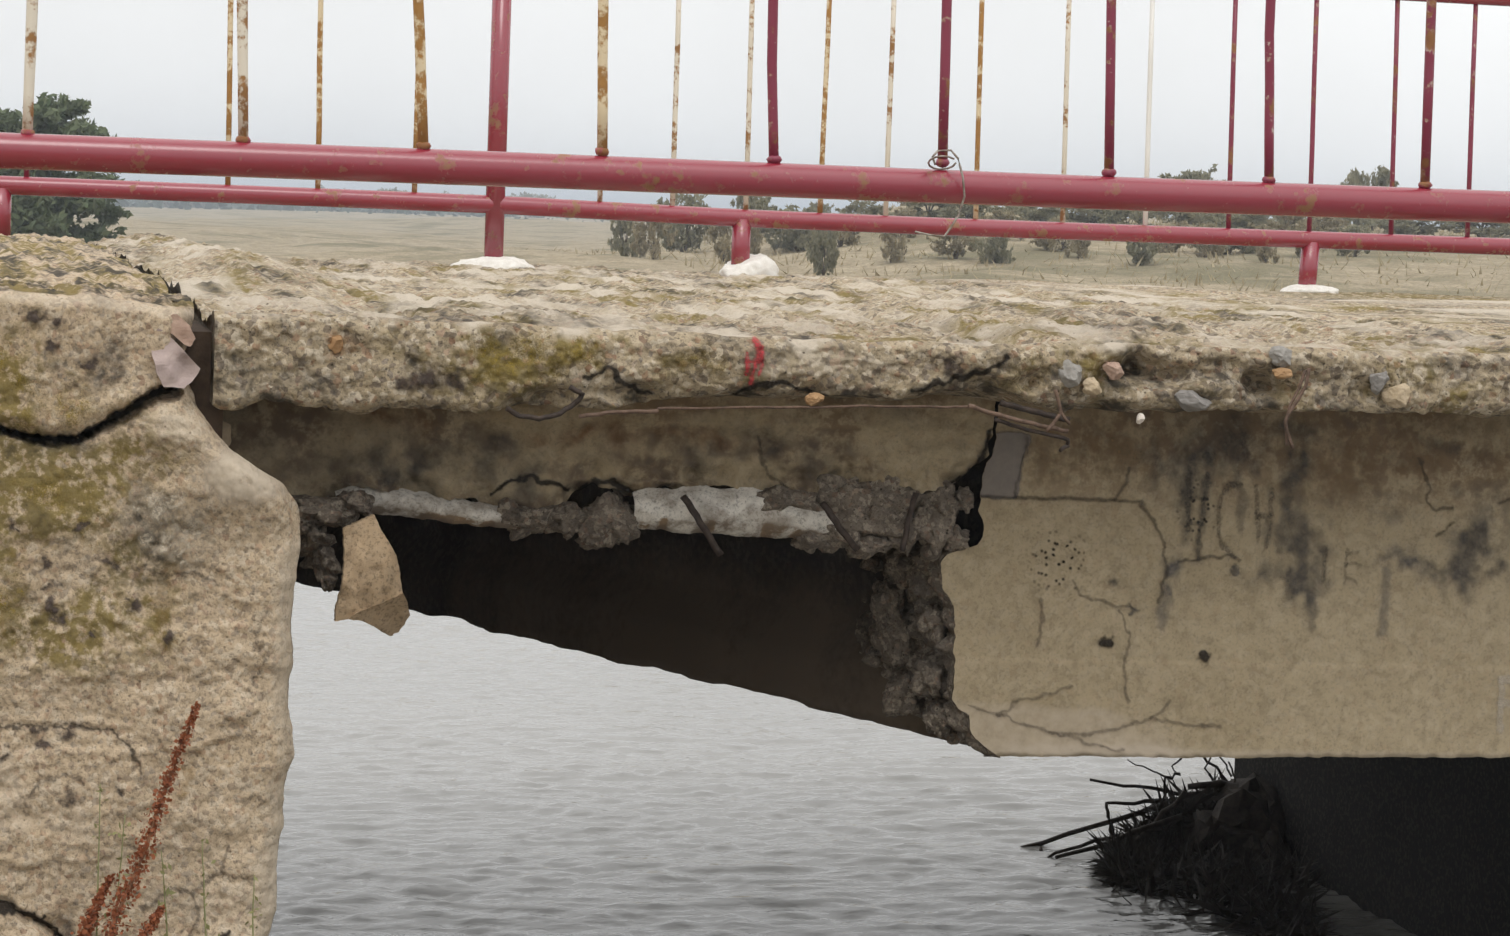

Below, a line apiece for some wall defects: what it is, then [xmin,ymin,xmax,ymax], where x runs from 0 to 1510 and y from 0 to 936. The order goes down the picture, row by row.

crack [0,386,178,446]
crack [945,429,1239,603]
damp [1287,525,1314,603]
damp [1450,524,1487,592]
spalling [335,474,1001,758]
crack [0,900,62,936]